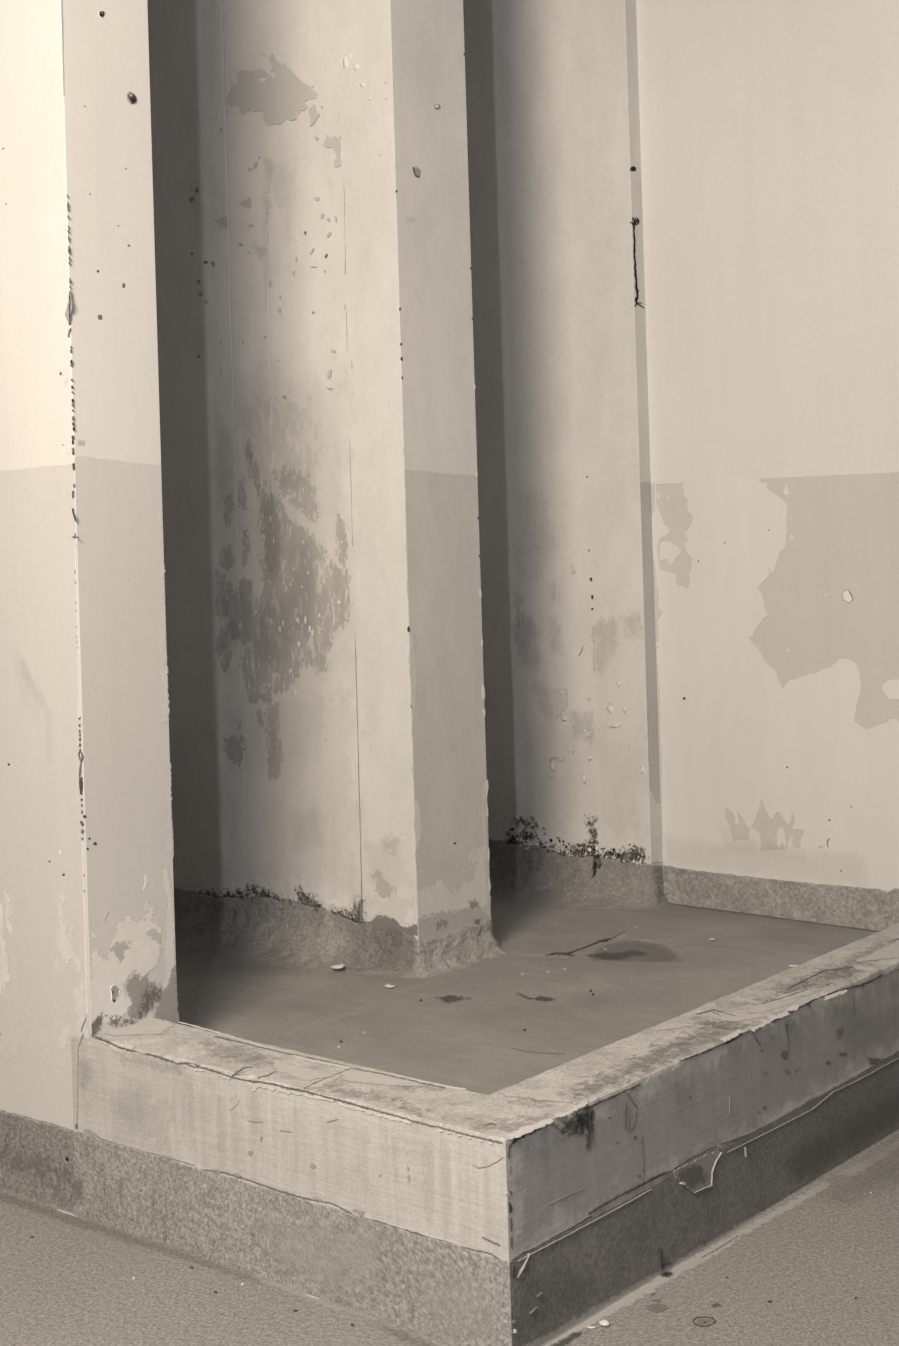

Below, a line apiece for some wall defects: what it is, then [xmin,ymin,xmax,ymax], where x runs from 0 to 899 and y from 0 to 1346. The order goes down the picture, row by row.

peeling [225,53,342,168]
crack [630,217,644,308]
peeling [47,194,179,1054]
peeling [242,475,354,706]
peeling [407,626,417,739]
peeling [615,479,899,890]
peeling [323,779,492,942]
leakage [505,814,649,864]
leakage [591,951,646,960]
flaking render [252,1083,412,1124]
flaking render [672,1151,722,1193]